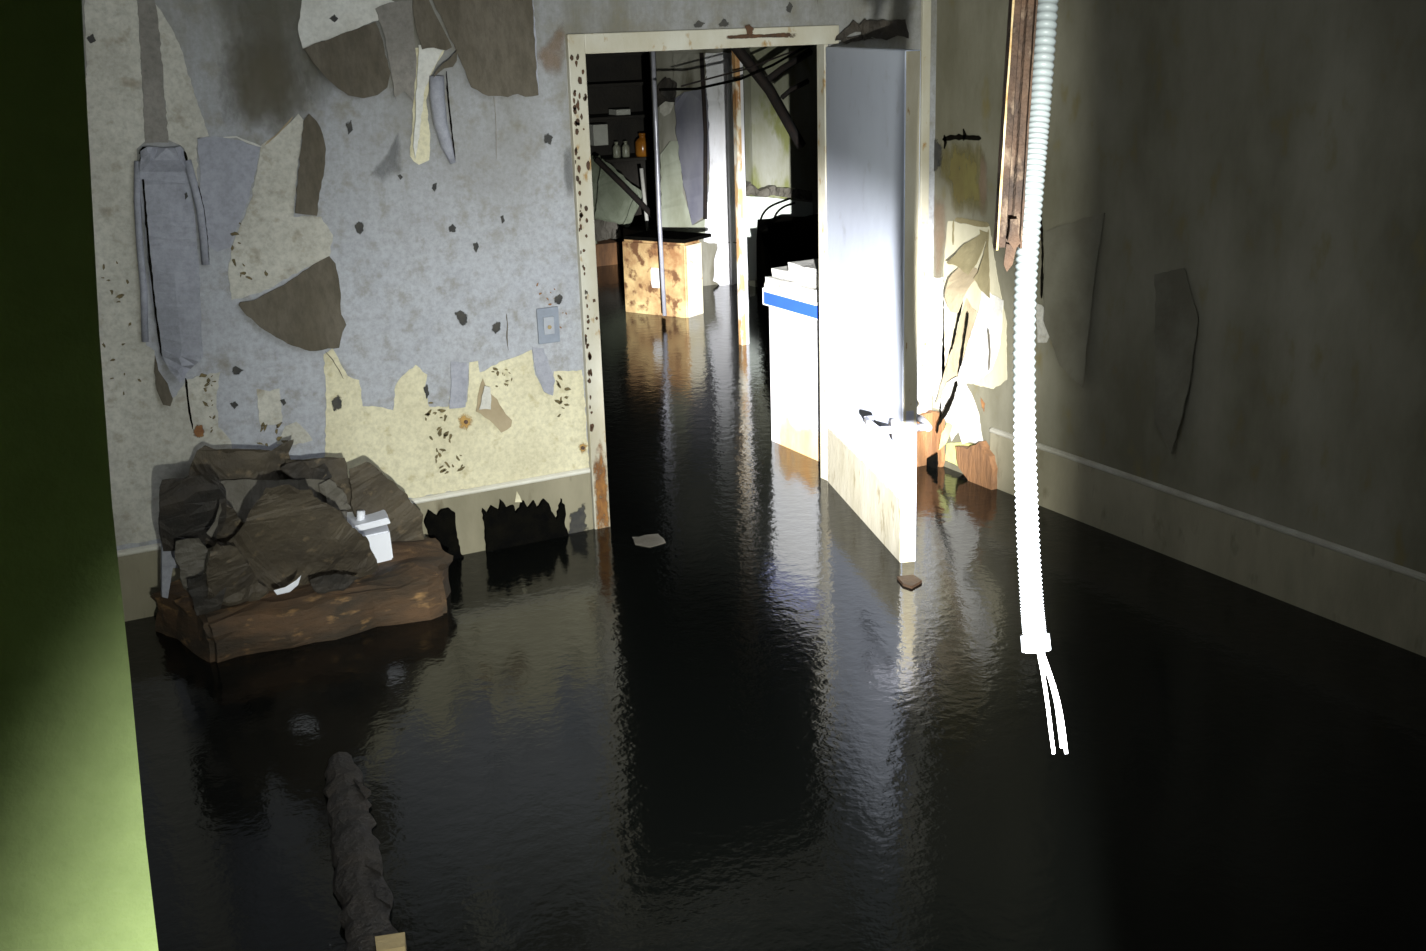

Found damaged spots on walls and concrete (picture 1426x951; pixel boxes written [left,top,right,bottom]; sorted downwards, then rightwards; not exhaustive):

leakage [237,0,320,119]
peeling [84,0,598,546]
peeling [932,221,1007,466]
rust [580,443,609,529]